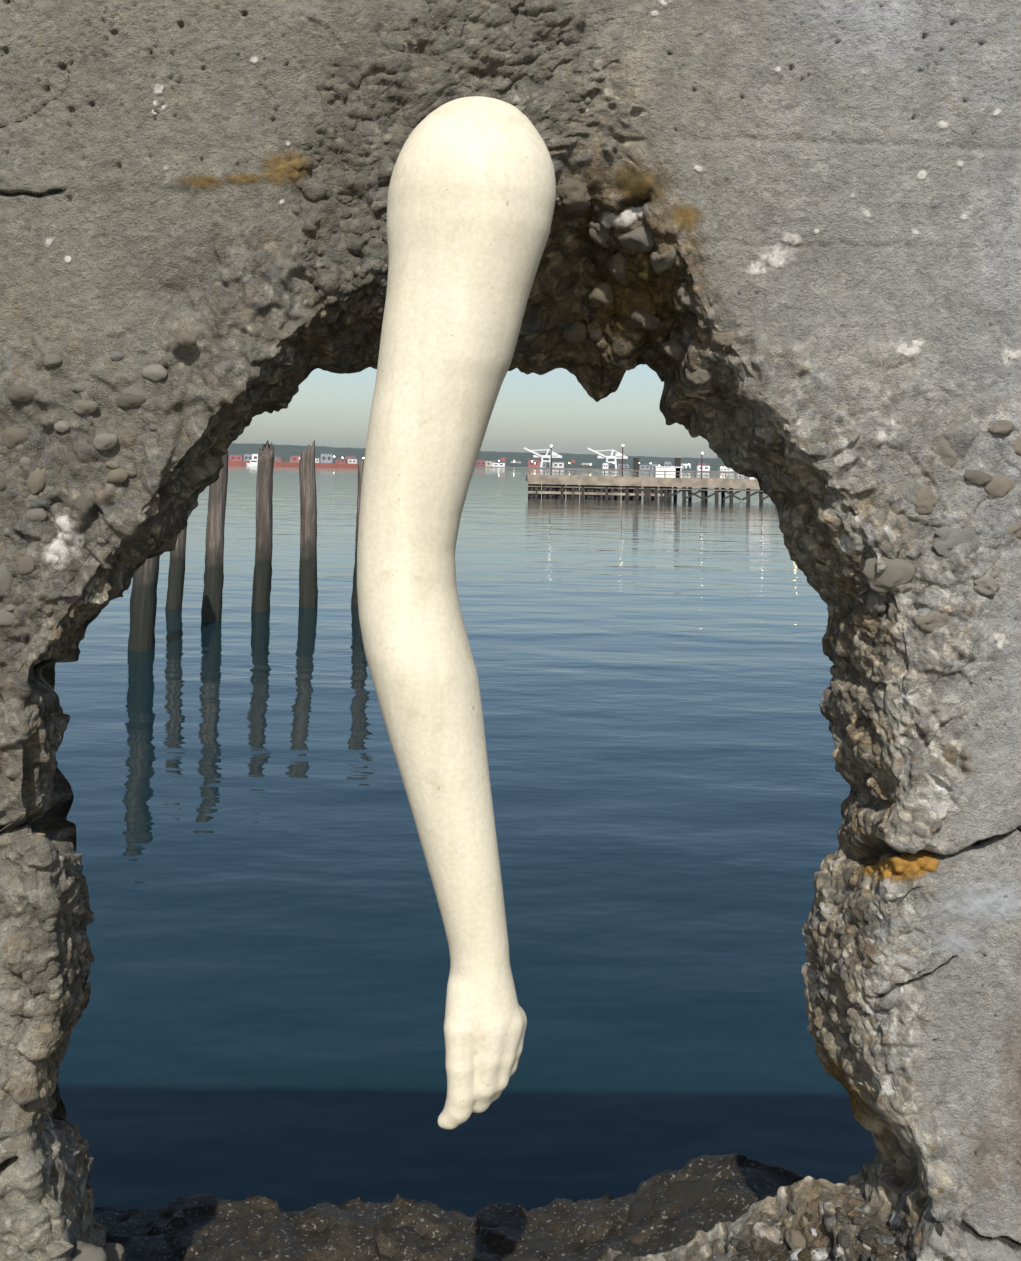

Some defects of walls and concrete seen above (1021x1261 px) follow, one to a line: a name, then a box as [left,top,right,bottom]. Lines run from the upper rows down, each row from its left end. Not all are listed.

spalling [289,0,622,328]
crack [0,189,66,198]
peeling [747,234,801,275]
spalling [555,178,714,390]
peeling [894,337,924,356]
peeling [1001,349,1021,367]
crack [0,818,32,833]
spalling [804,535,901,1089]
crack [971,829,1021,846]
spalling [0,866,95,1127]
crack [0,1158,12,1174]
crack [955,1222,1021,1252]